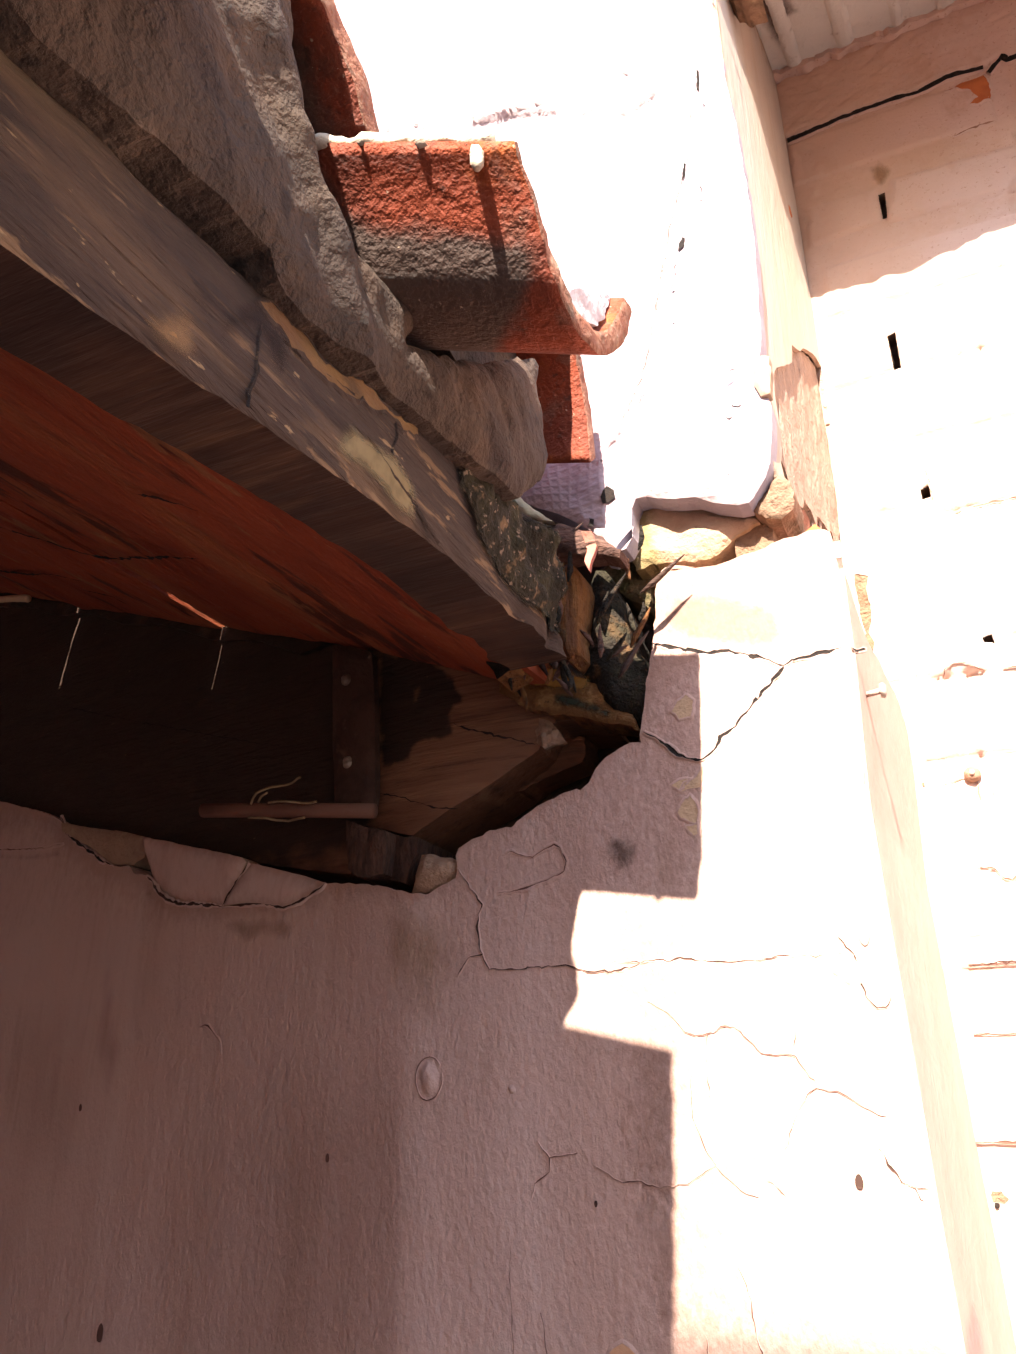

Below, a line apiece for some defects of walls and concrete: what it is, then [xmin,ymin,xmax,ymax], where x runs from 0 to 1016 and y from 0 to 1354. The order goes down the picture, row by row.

flaking render [753,351,840,542]
spalling [515,497,556,525]
peeling [852,573,879,660]
peeling [728,655,759,683]
crack [642,642,867,763]
crack [60,815,114,866]
flaking render [61,823,324,908]
crack [146,862,327,911]
crack [456,841,895,1010]
peeling [669,757,713,839]
crack [532,1001,928,1203]
crack [735,1260,764,1354]